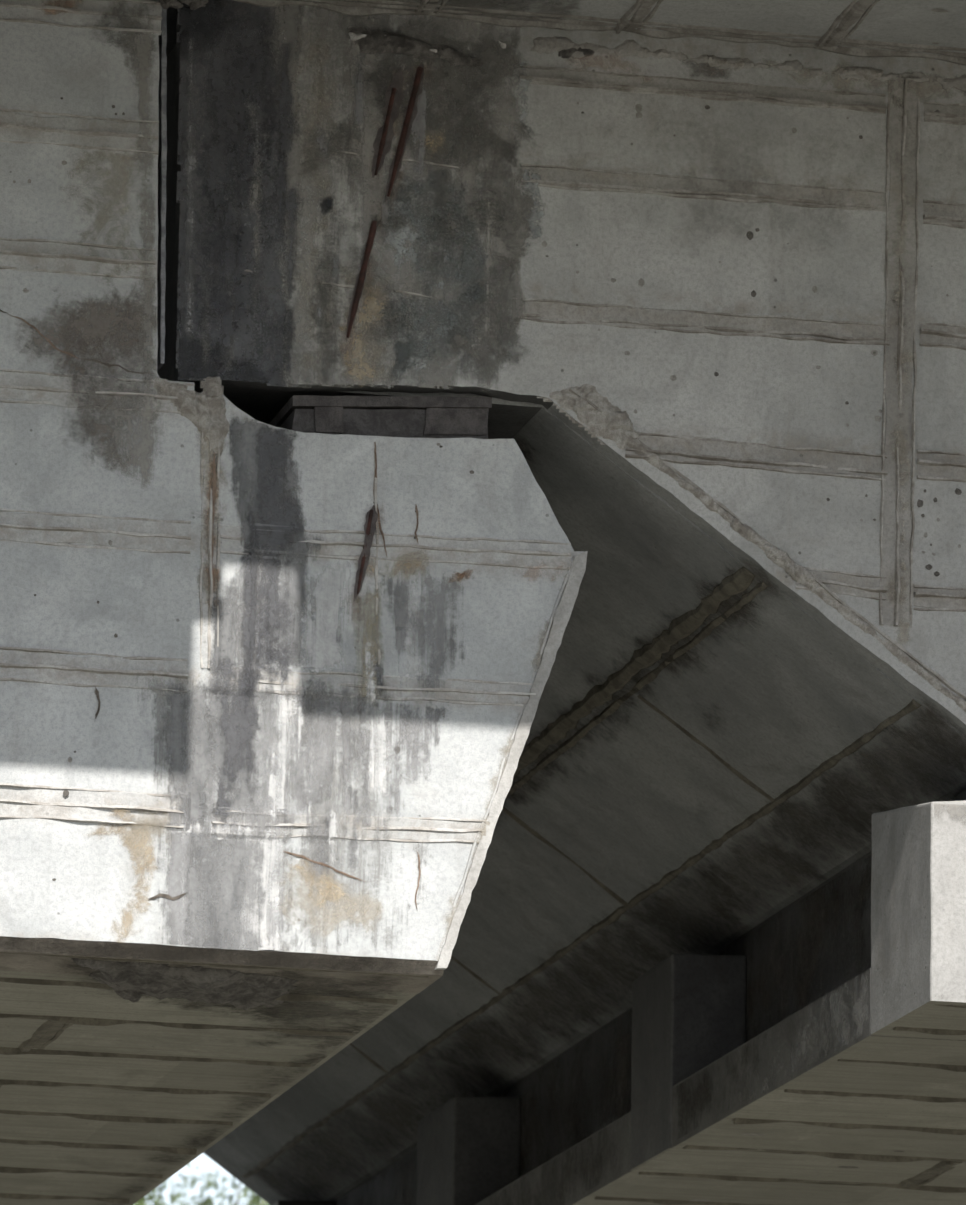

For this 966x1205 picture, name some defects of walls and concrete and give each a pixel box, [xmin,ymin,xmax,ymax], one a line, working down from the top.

crack [0,309,154,374]
damp [25,4,157,482]
damp [176,0,577,389]
damp [0,418,464,973]
damp [502,568,774,803]
spalling [537,384,966,712]
damp [258,703,966,1205]